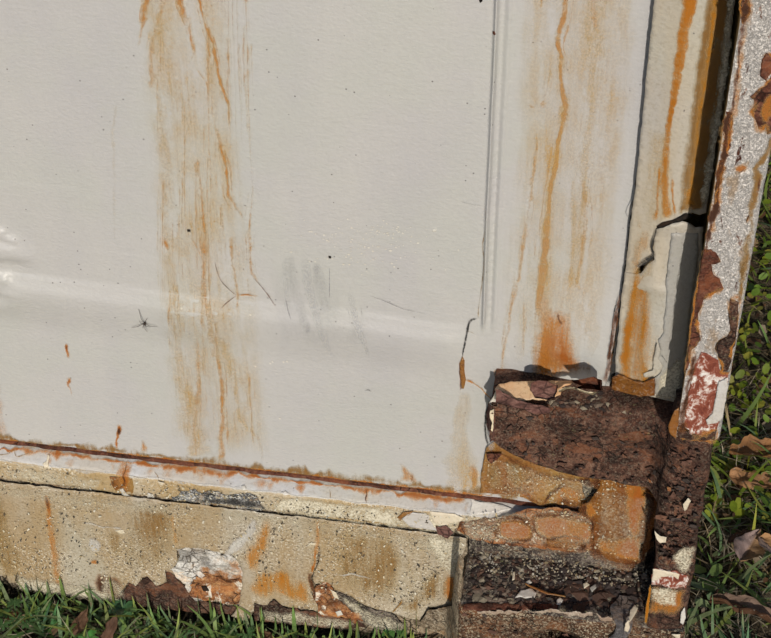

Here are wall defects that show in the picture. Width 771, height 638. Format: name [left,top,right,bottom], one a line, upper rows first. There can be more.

corrosion [536,0,572,308]
corrosion [736,52,771,225]
corrosion [655,0,752,443]
crack [459,213,491,399]
crack [605,184,694,384]
corrosion [0,426,487,503]
corrosion [96,571,236,615]
peeling [171,548,243,606]
crack [307,526,318,599]
corrosion [254,573,408,634]
corrosion [435,507,593,552]
corrosion [609,587,681,638]